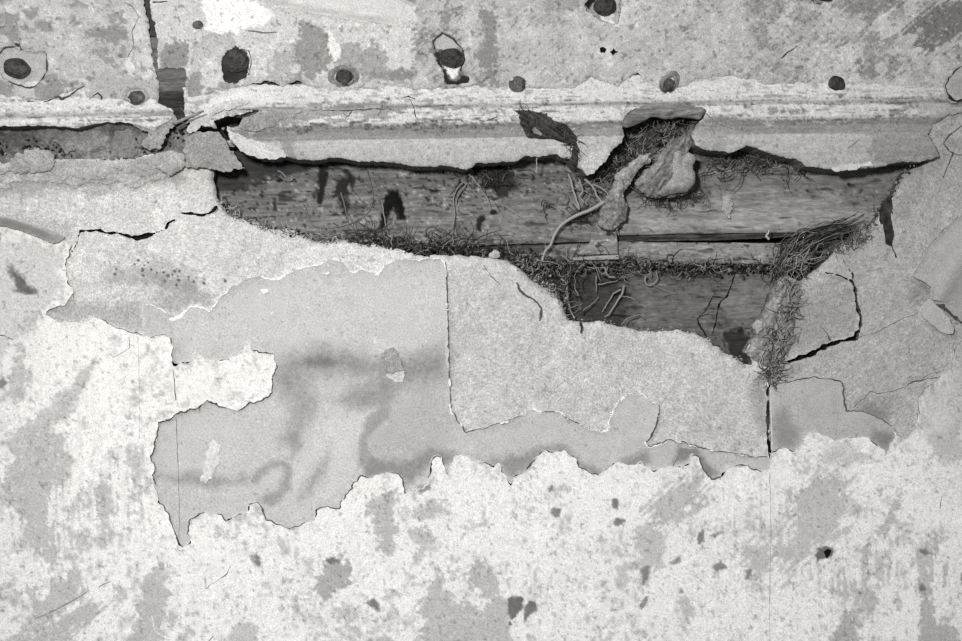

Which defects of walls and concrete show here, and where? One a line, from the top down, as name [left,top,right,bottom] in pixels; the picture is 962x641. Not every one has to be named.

crack [69,206,218,252]
peeling [0,64,962,546]
crack [763,268,916,522]
crack [942,126,962,178]